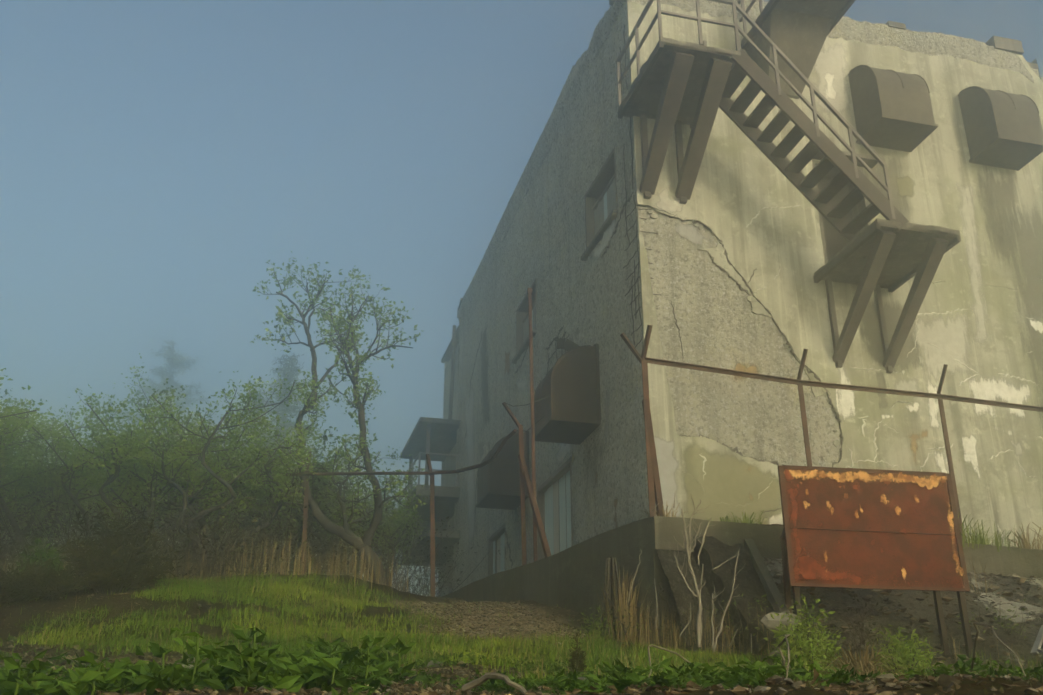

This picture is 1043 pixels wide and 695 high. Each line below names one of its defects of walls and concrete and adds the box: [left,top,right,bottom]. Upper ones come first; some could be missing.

crack [671,301,684,358]